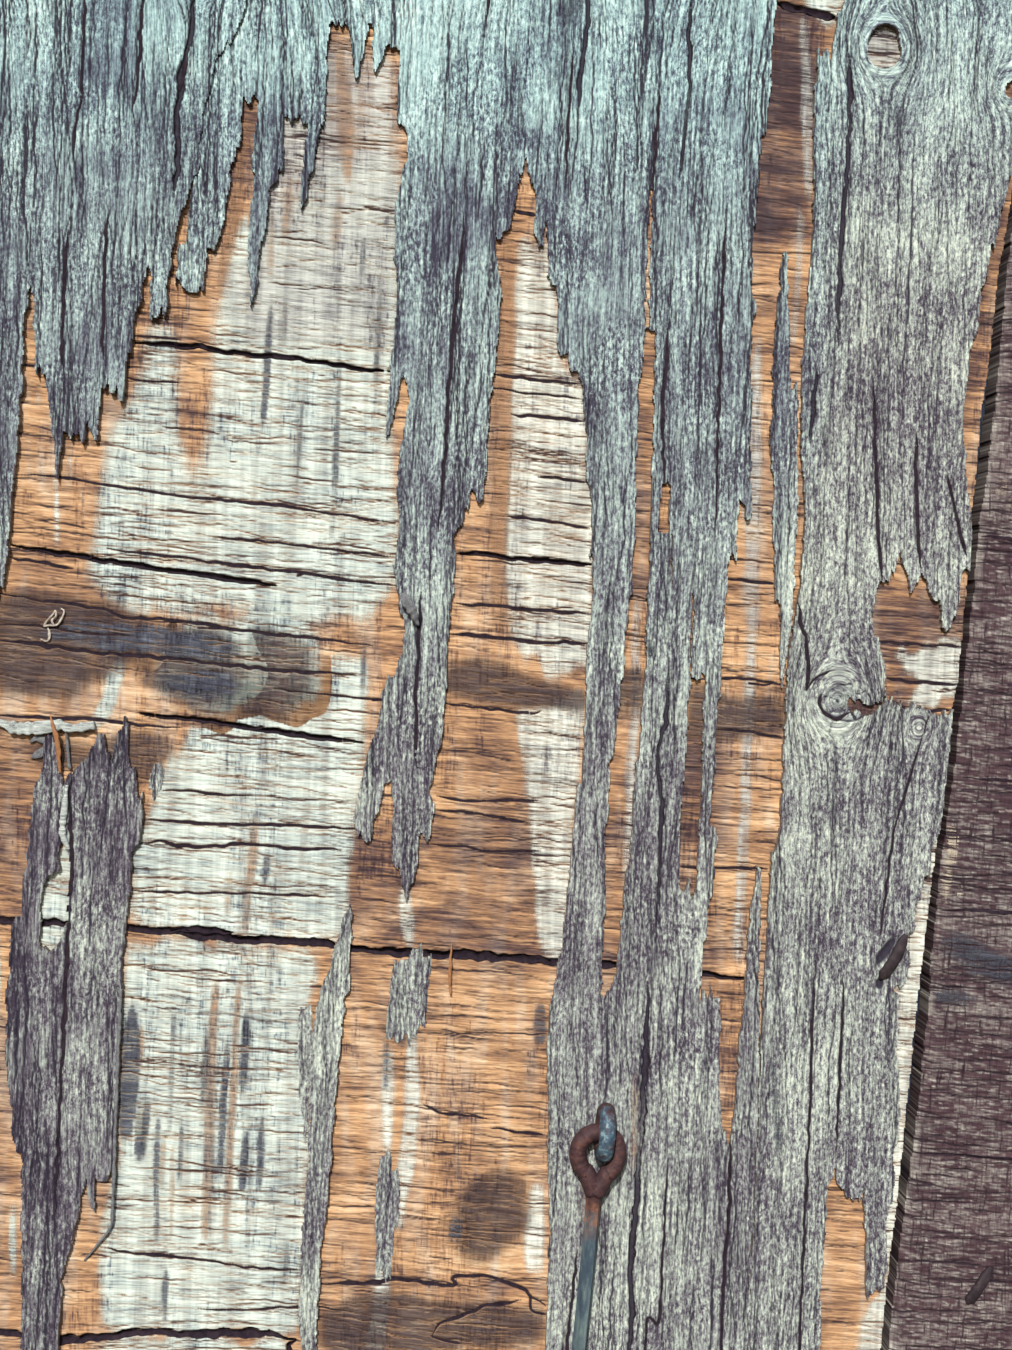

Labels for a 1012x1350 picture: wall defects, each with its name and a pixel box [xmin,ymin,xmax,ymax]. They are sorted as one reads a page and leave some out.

peeling [0,239,136,589]
peeling [874,486,973,631]
water stain [0,593,310,726]
crack [0,537,591,769]
peeling [353,465,461,901]
water stain [60,744,90,770]
water stain [106,732,171,776]
crack [142,789,355,851]
crack [127,925,558,965]
peeling [747,711,953,1350]
water stain [449,1171,544,1272]
crack [59,1247,577,1350]